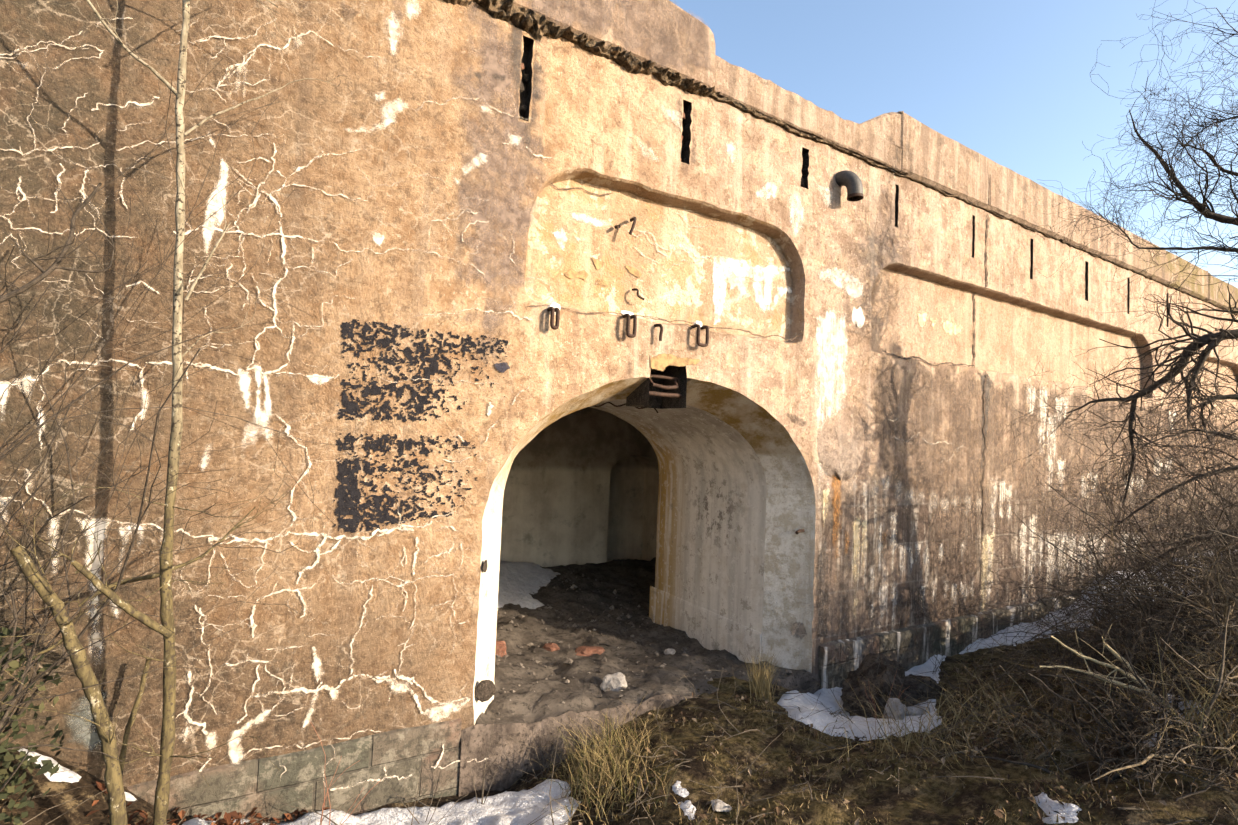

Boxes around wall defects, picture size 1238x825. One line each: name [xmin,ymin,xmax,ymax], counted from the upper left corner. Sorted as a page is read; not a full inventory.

crack [0,17,803,430]
peeling [713,257,792,324]
peeling [819,268,863,298]
peeling [333,319,508,533]
crack [386,378,529,463]
spalling [650,353,700,371]
efflorescence [816,310,847,422]
water stain [848,358,1238,625]
crack [0,416,486,791]
water stain [817,541,829,637]